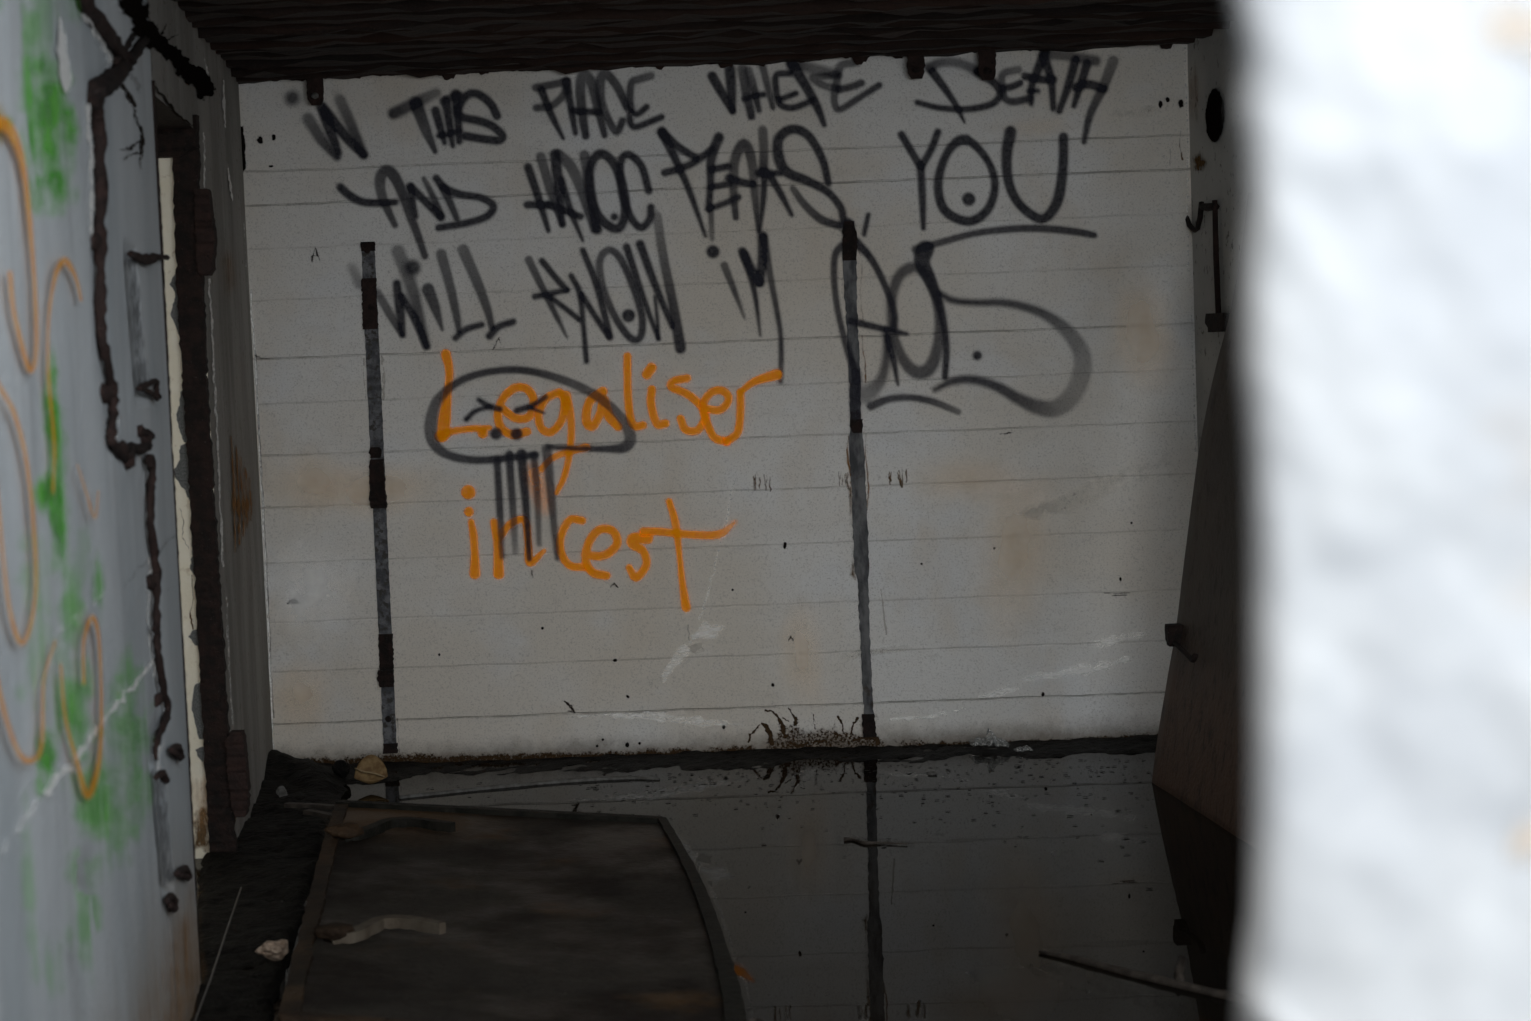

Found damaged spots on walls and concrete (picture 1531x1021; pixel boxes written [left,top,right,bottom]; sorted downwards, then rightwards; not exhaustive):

leakage [44,663,152,796]